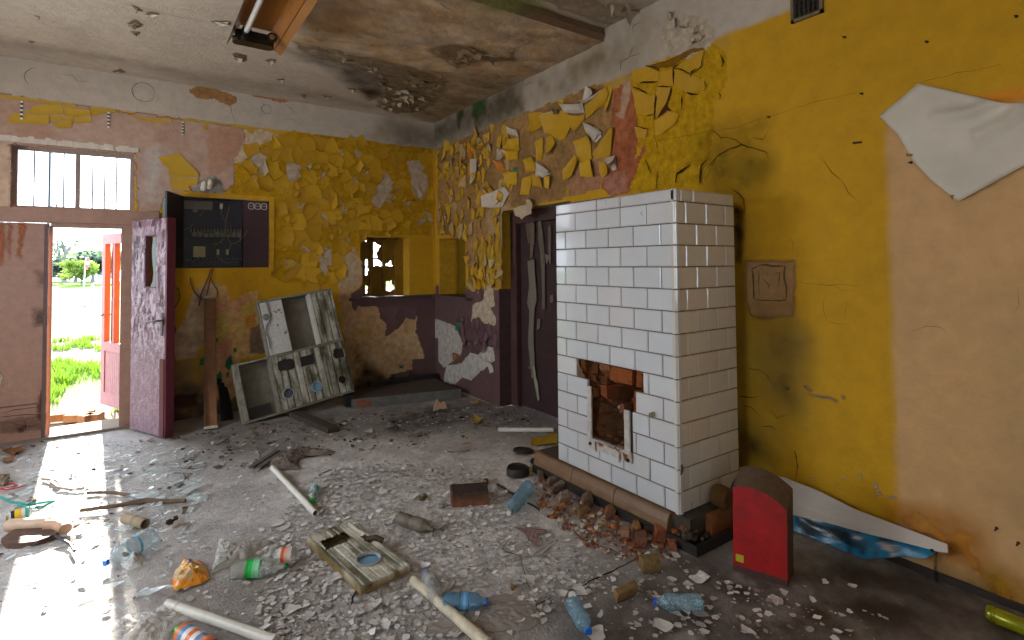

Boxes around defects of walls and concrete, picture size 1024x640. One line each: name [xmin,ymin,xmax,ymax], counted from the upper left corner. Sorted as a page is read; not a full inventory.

peeling [431,45,514,68]
peeling [661,11,715,59]
crack [619,22,852,195]
peeling [0,80,646,400]